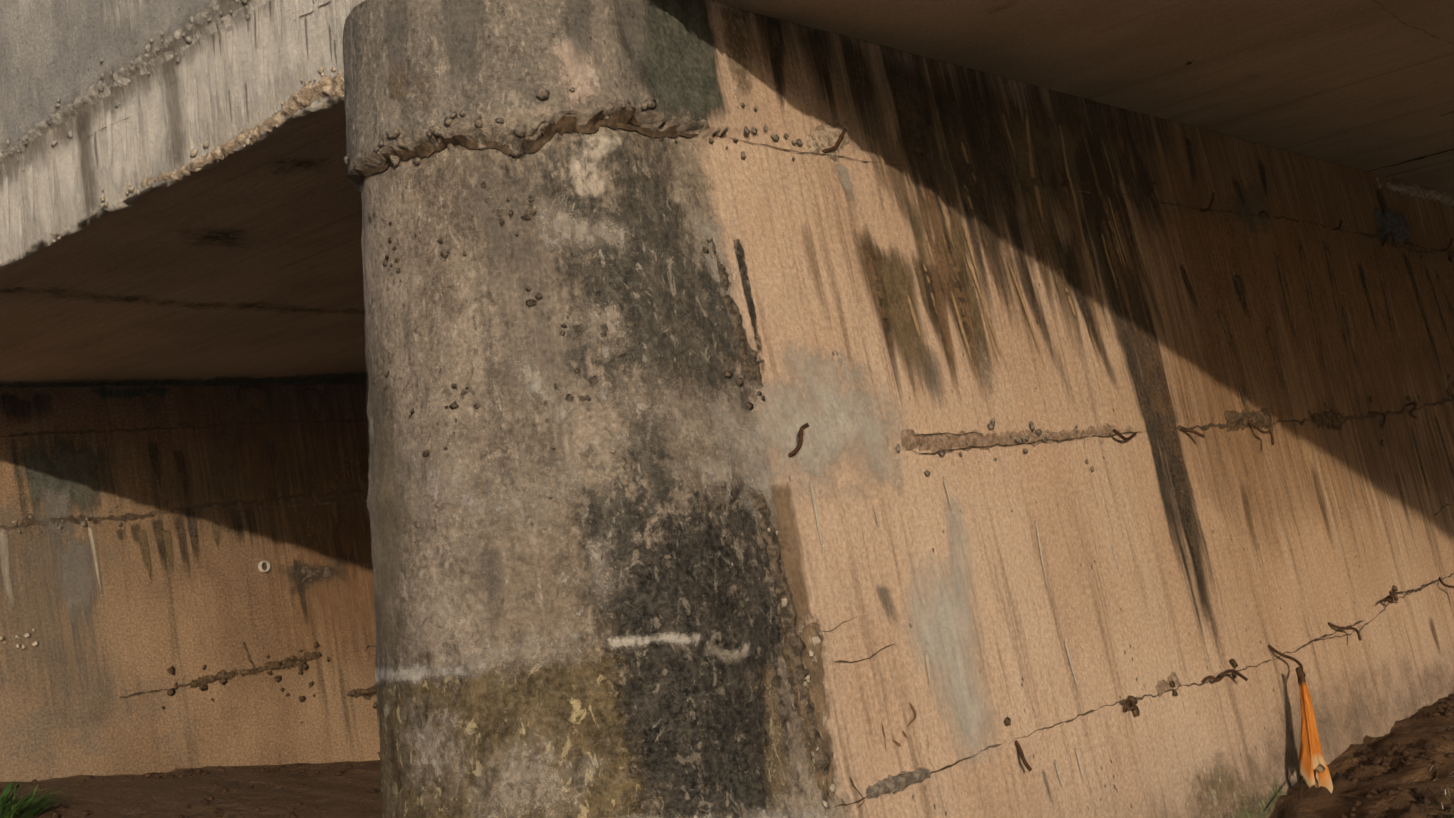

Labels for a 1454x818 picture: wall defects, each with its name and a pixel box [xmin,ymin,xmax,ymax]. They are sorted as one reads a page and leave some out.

spalling [0,0,250,181]
spalling [125,66,344,195]
water stain [443,0,482,78]
water stain [117,375,398,633]
water stain [608,541,772,774]
crack [802,618,896,663]
water stain [617,0,1211,622]
water stain [917,478,983,743]
crack [833,573,1454,808]
crack [1147,373,1454,447]